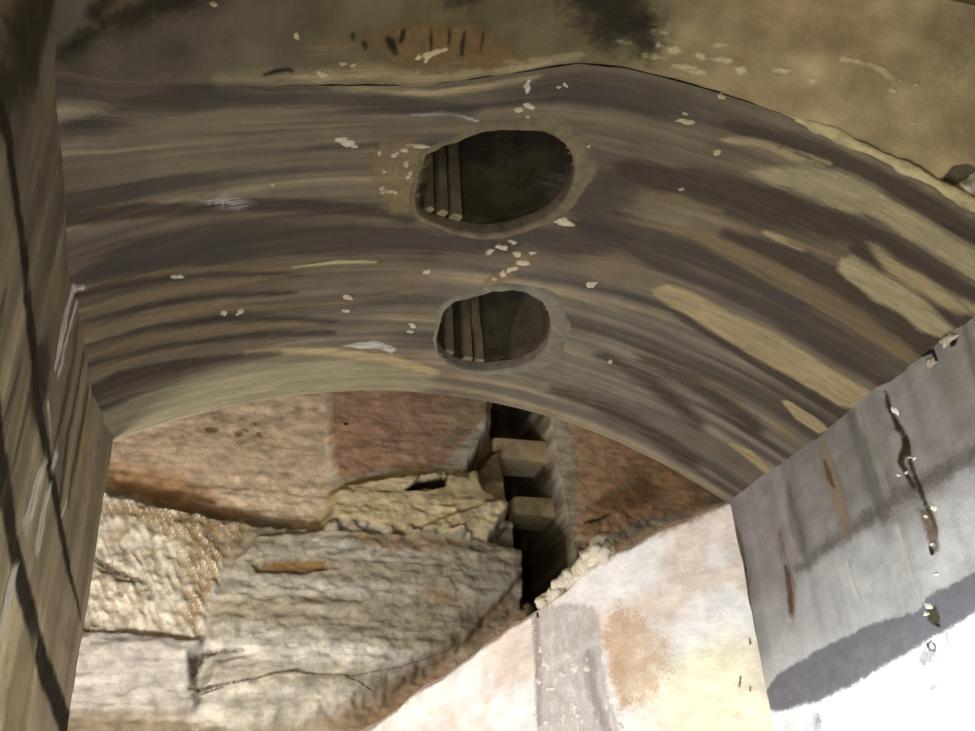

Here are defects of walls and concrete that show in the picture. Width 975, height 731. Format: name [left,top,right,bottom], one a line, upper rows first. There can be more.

flaking render [217,24,585,119]
water stain [574,0,680,59]
peeling [485,240,537,286]
peeling [553,217,575,227]
water stain [513,122,975,385]
spalling [944,164,975,193]
water stain [0,0,517,731]
water stain [597,354,762,433]
water stain [652,283,896,516]
crack [884,391,938,555]
spalling [534,477,659,609]
crack [189,650,416,695]